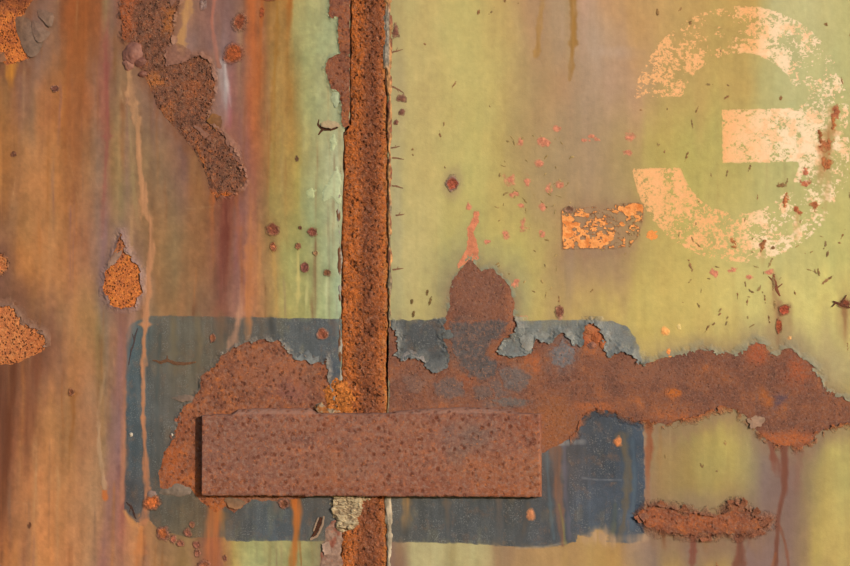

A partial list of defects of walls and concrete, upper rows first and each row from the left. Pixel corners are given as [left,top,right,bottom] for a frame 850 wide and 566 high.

spalling [222,12,249,65]
rust [814,100,848,227]
peeling [560,202,658,251]
rust [116,0,356,566]
spalling [554,305,565,321]
spalling [775,304,792,340]
rust [388,246,850,566]
peeling [320,520,343,566]